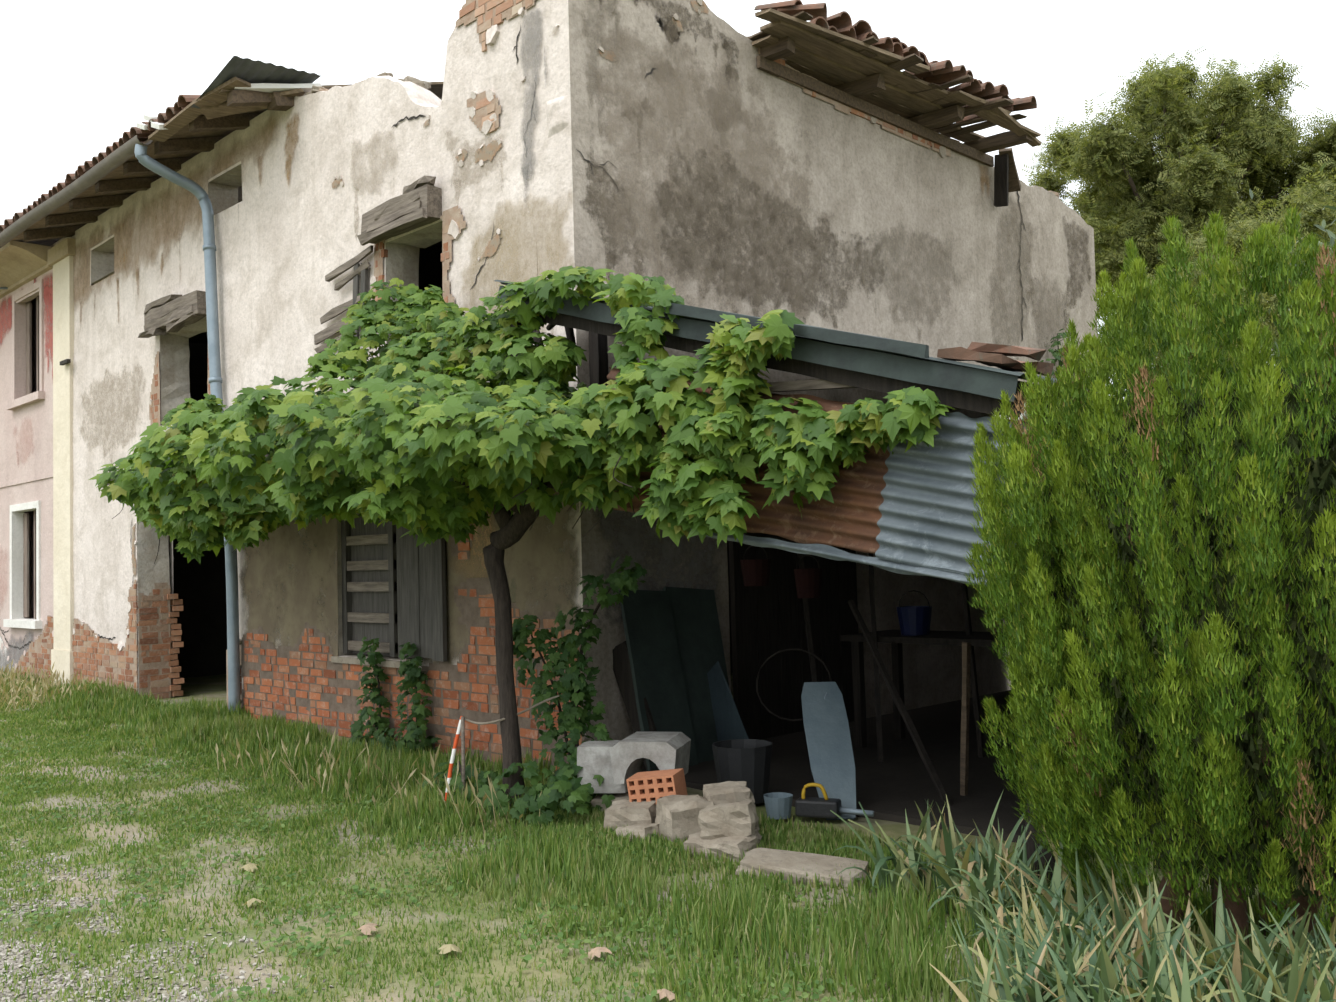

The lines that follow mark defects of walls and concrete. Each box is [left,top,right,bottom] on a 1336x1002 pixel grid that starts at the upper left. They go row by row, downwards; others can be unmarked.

flaking render [455,0,535,52]
spalling [456,89,502,167]
water stain [580,0,955,328]
flaking render [440,205,466,312]
crack [1017,191,1027,341]
corrosion [757,393,855,423]
corrosion [613,464,656,513]
corrosion [736,445,890,554]
flaking render [0,615,54,680]
flaking render [72,522,172,700]
flaking render [226,578,503,762]
flaking render [511,603,584,772]